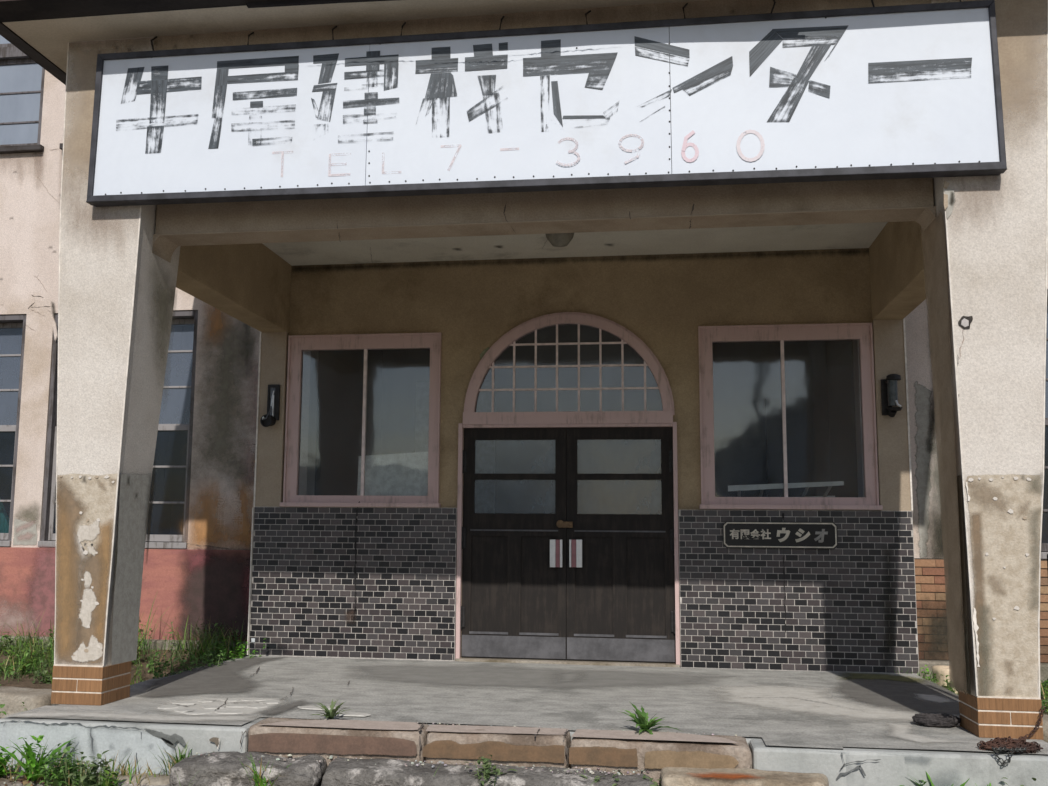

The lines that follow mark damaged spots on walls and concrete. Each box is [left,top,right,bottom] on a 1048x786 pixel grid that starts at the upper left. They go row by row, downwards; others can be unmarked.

damp [154,272,175,365]
damp [202,324,258,477]
peeling [57,473,118,557]
damp [147,467,155,557]
damp [358,211,989,743]
peeling [71,571,103,662]
damp [179,551,251,641]